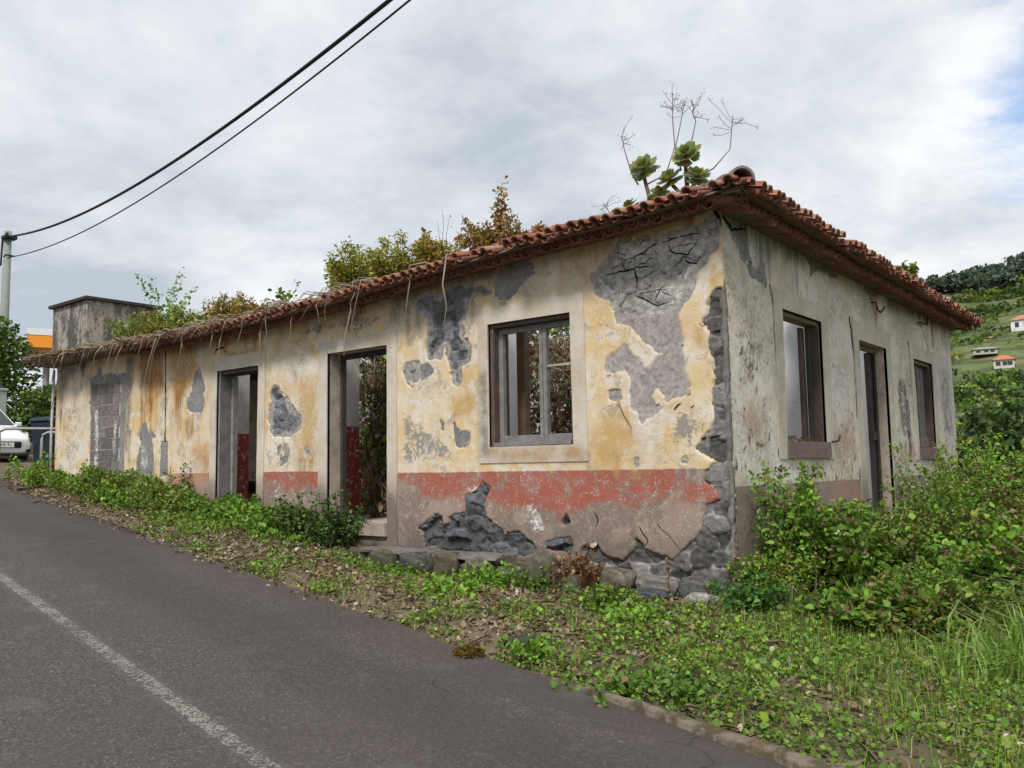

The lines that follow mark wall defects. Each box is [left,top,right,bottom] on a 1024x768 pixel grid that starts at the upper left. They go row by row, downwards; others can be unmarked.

crack [606,210,747,306]
flaking render [403,260,536,387]
flaking render [589,209,767,424]
flaking render [89,366,168,476]
flaking render [186,368,206,413]
flaking render [267,384,302,467]
peeling [404,416,471,463]
flaking render [417,288,763,590]